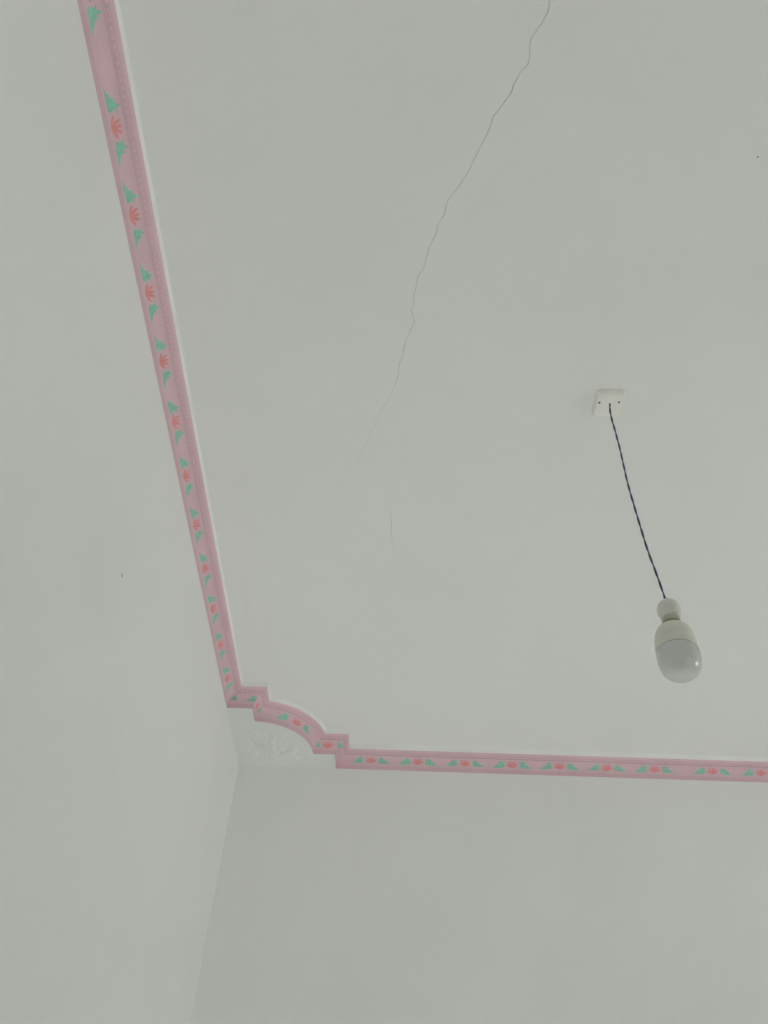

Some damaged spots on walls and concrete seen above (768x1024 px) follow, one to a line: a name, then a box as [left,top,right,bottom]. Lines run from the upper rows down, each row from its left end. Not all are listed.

crack [356,0,550,462]